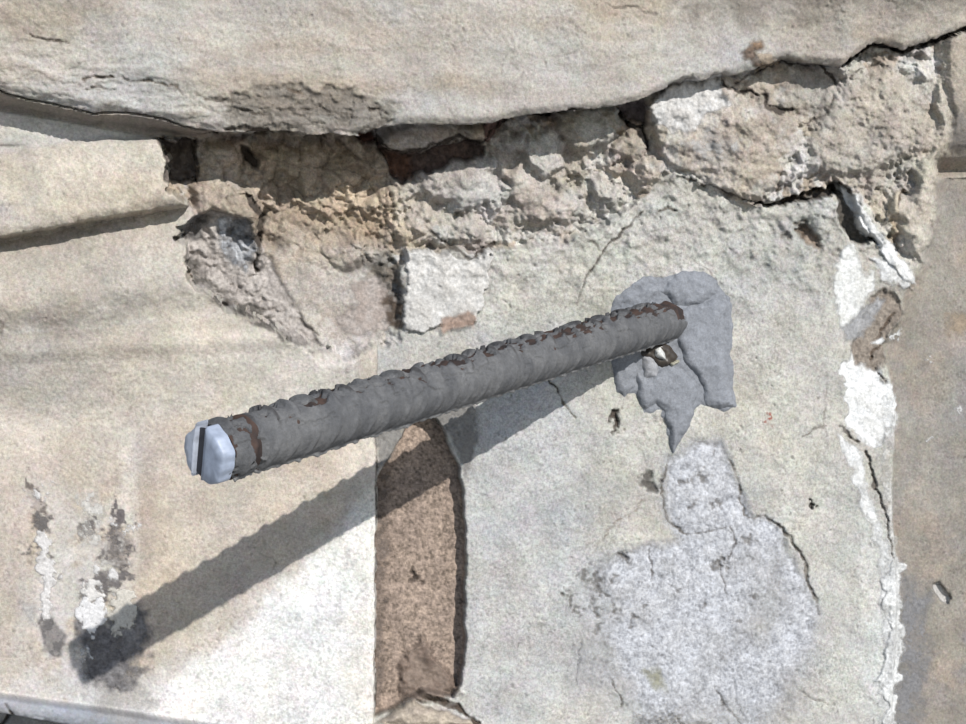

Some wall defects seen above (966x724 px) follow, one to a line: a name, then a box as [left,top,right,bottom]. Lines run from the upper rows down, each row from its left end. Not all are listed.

spalling [157,137,199,183]
spalling [205,84,507,185]
crack [616,98,649,150]
spalling [647,74,738,159]
crack [721,26,966,124]
spalling [181,210,318,345]
spalling [337,231,496,336]
spalling [374,405,477,714]